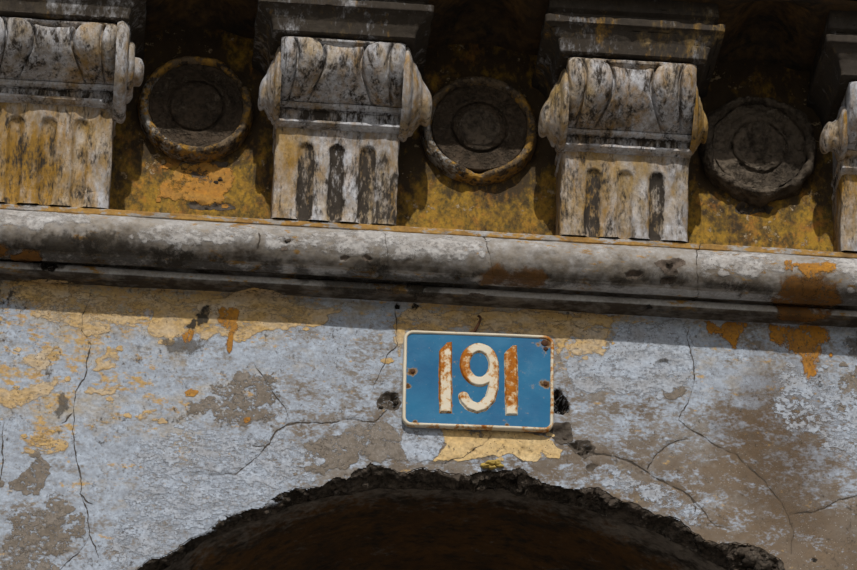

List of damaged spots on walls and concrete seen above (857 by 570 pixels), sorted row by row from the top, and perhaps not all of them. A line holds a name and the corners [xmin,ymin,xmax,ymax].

peeling [156,161,236,211]
damp [0,231,281,274]
peeling [7,264,343,345]
peeling [129,225,491,262]
damp [294,259,478,300]
crack [374,314,398,384]
peeling [380,307,697,400]
crack [0,424,8,479]
crack [62,294,99,565]
crack [207,364,391,475]
spalling [84,371,785,570]
crack [567,327,857,553]